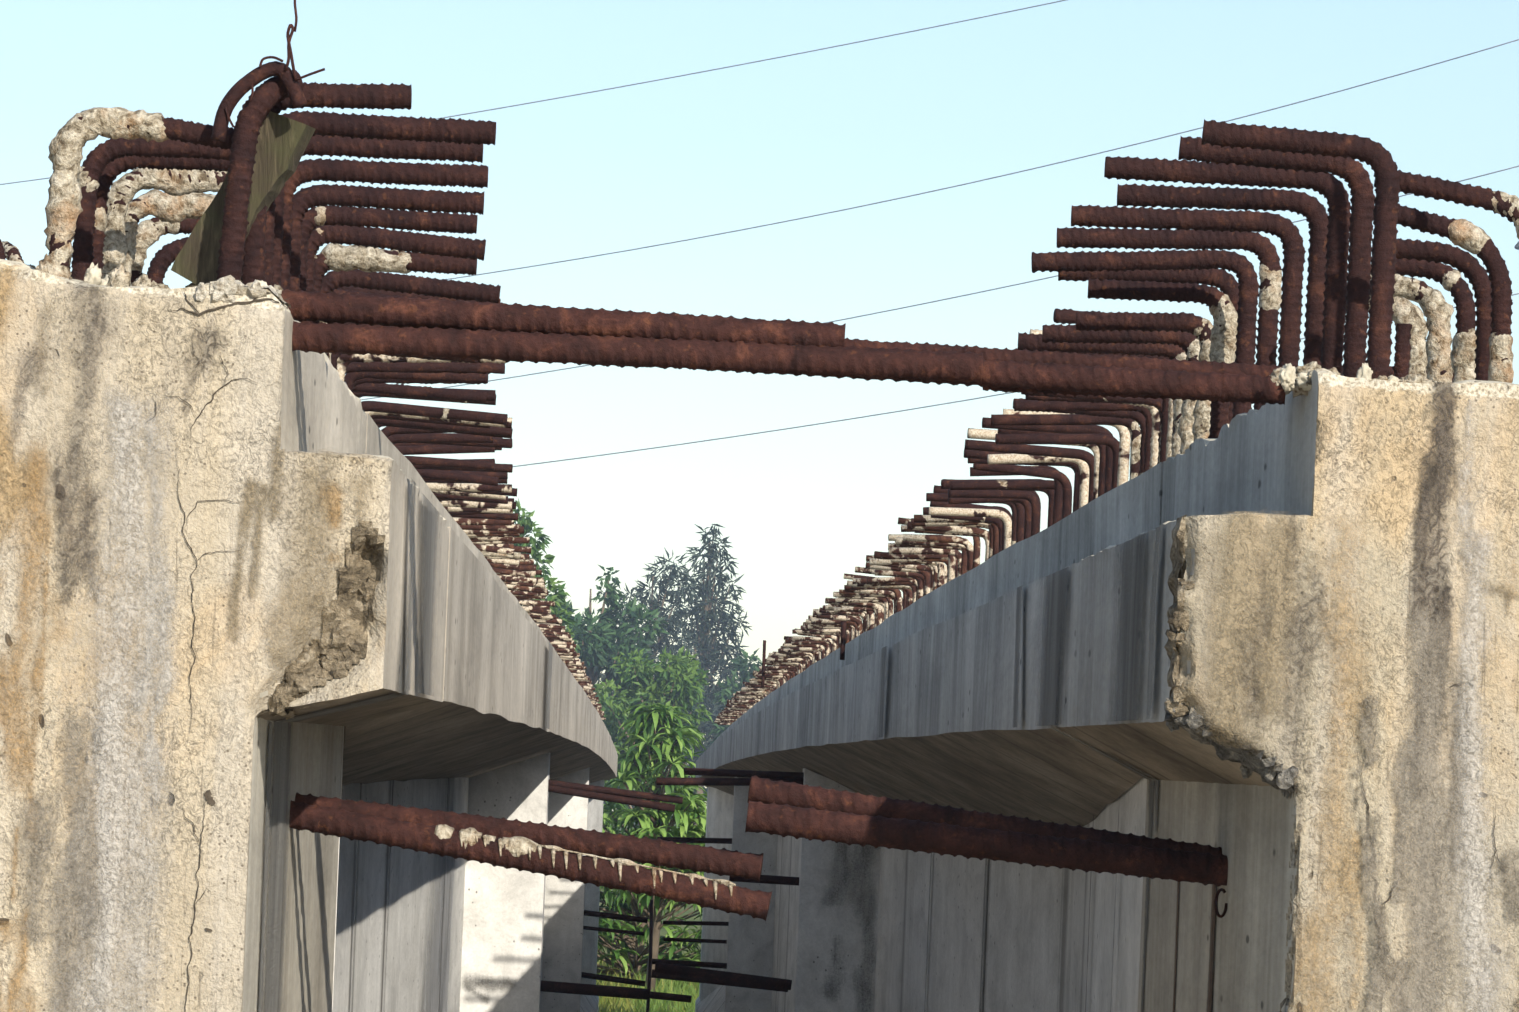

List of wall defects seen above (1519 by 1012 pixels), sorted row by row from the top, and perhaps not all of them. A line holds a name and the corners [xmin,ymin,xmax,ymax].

leakage [15,347,44,430]
spalling [187,275,291,308]
leakage [21,281,174,1012]
crack [146,355,256,740]
leakage [229,426,283,641]
spalling [268,521,386,720]
spalling [1164,515,1299,799]
leakage [1389,382,1517,1012]
crack [184,785,209,1012]